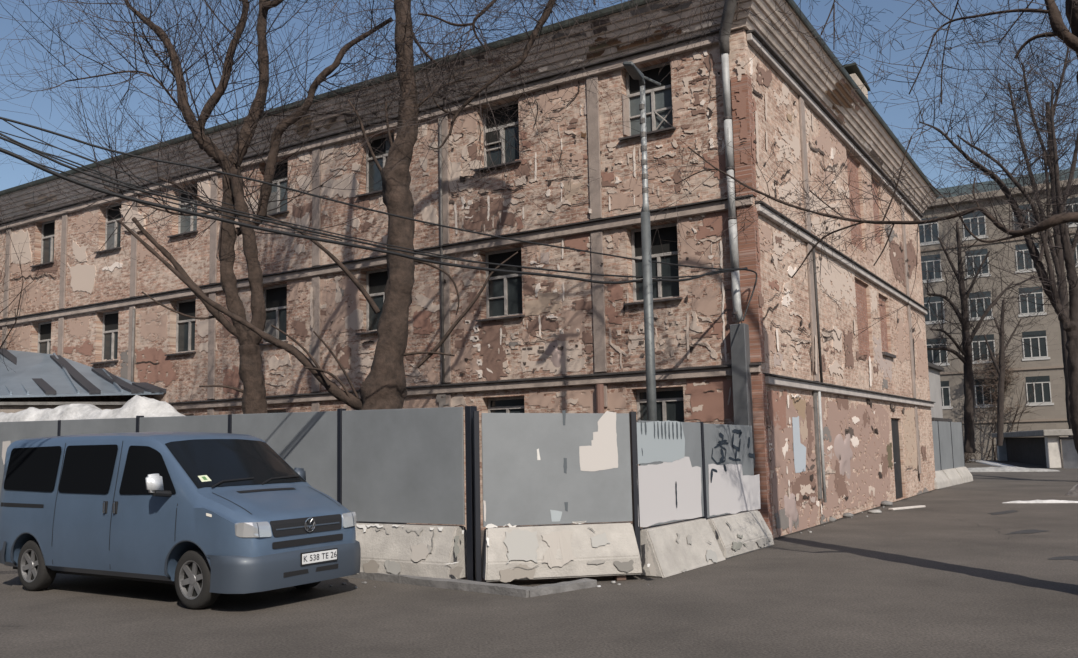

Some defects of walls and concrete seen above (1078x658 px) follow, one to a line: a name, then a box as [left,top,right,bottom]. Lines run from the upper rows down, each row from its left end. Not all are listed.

spalling [756,63,772,87]
spalling [514,88,617,188]
spalling [452,292,480,376]
spalling [519,316,594,363]
spalling [863,398,878,433]
spalling [790,403,817,508]
spalling [834,460,848,501]
spalling [879,454,888,479]